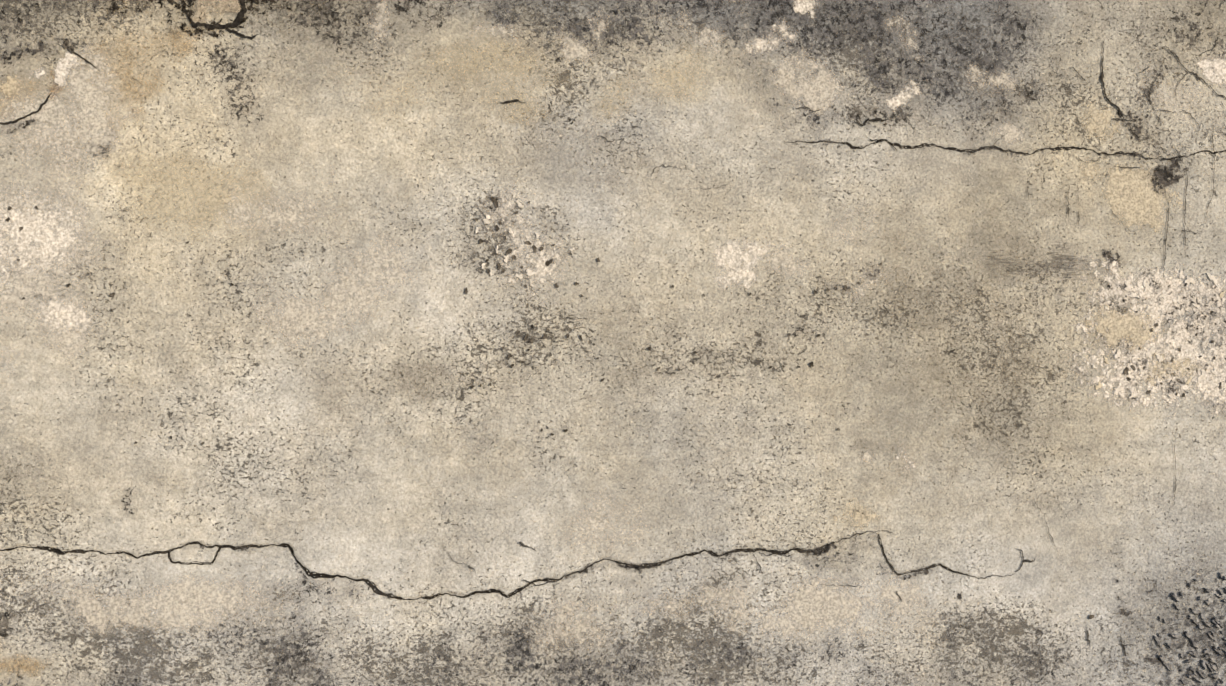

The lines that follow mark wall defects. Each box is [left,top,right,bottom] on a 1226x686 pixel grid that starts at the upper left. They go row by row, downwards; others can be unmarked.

water stain [0,0,151,90]
water stain [194,22,268,144]
water stain [271,0,463,74]
water stain [477,0,1051,146]
crack [784,41,1226,274]
peeling [1070,256,1226,421]
crack [0,503,1067,601]